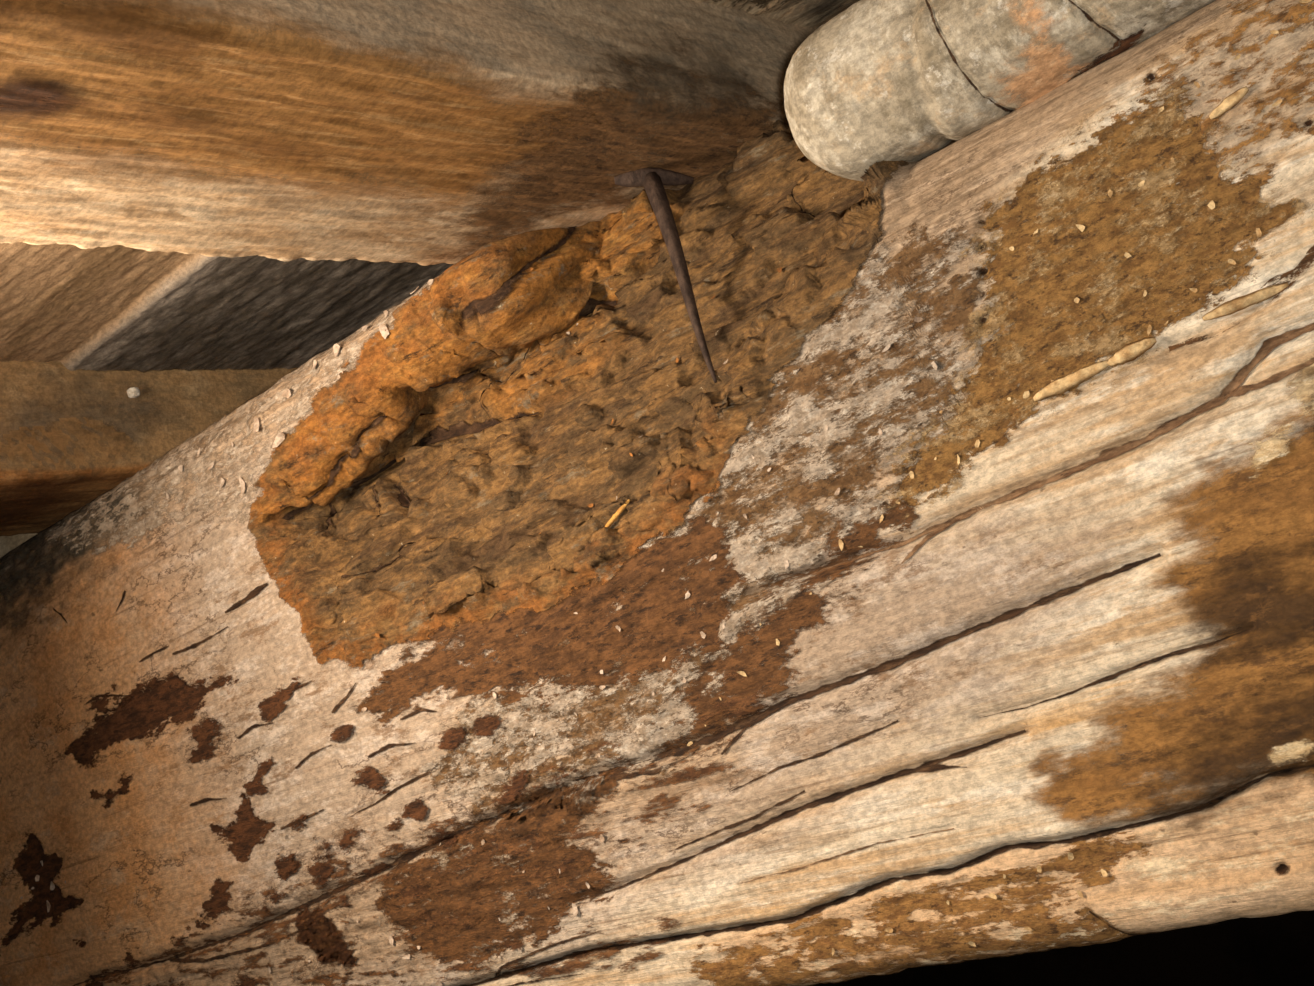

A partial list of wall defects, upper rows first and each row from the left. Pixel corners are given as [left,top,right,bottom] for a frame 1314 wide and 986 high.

water stain [0,0,603,204]
water stain [107,255,434,373]
crack [459,226,576,328]
crack [579,298,617,316]
crack [282,347,539,529]
crack [735,246,1314,603]
crack [341,542,416,579]
water stain [1029,405,1314,826]
crack [73,553,1245,986]
crack [461,764,1314,986]